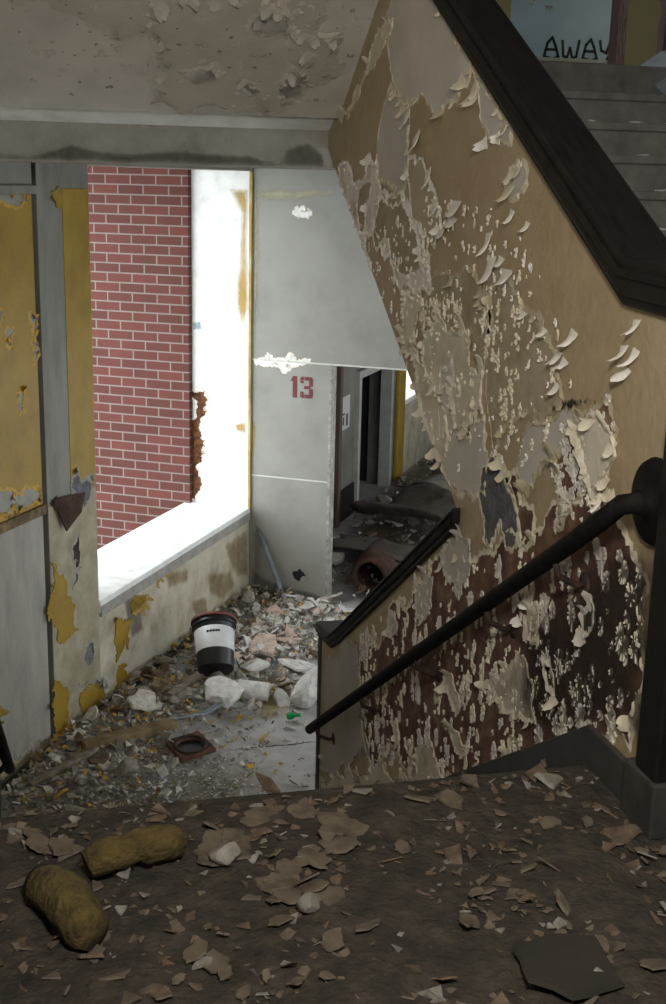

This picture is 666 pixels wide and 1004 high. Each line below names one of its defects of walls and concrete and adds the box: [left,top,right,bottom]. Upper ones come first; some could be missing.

peeling [28,311,41,367]
flaking render [70,467,95,514]
spalling [192,384,210,502]
peeling [318,0,650,789]
peeling [46,533,81,644]
spalling [290,565,309,586]
peeling [0,592,154,782]